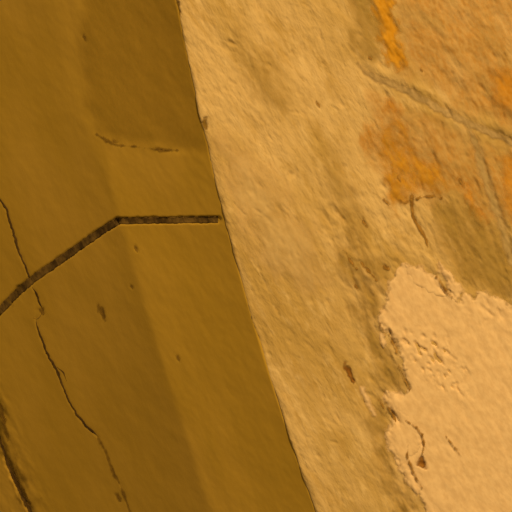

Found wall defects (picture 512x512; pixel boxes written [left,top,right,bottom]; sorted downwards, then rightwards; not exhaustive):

corrosion [371,0,407,68]
crack [0,199,128,512]
flaking render [378,261,512,512]